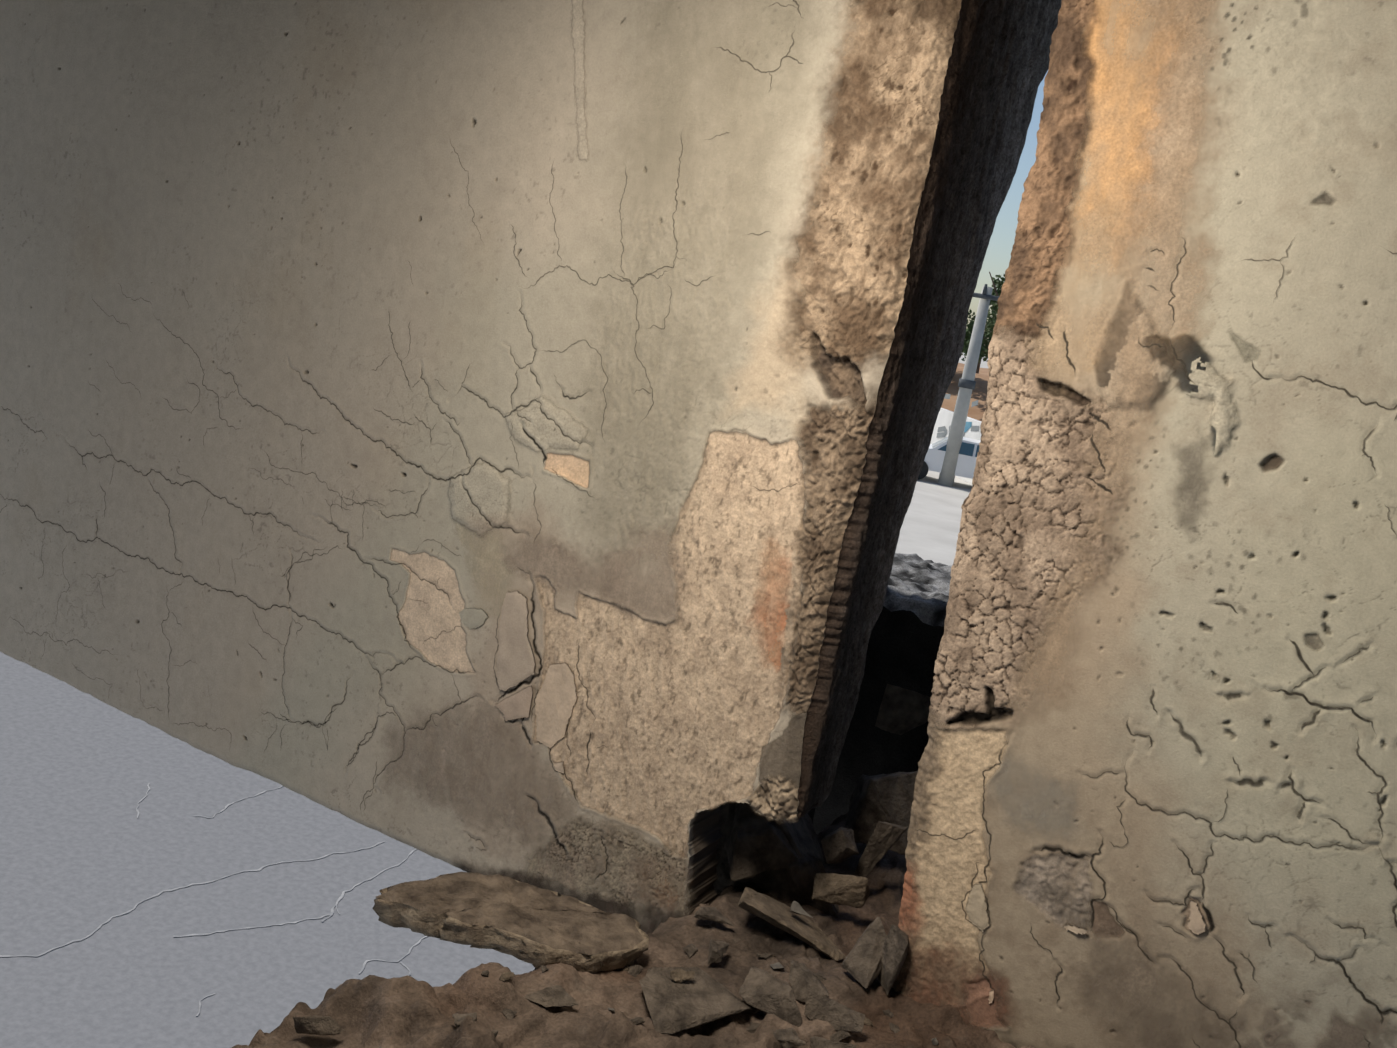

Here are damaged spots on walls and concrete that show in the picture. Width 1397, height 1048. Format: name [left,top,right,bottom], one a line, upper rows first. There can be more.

rust [1074,0,1196,273]
crack [5,145,709,914]
peeling [390,0,960,857]
spalling [892,0,1124,1026]
crack [1036,323,1075,371]
rust [1036,264,1110,367]
crack [1087,413,1112,493]
crack [1138,242,1192,382]
crack [1246,240,1293,297]
crack [1252,363,1397,470]
crack [1040,641,1397,1048]
crack [1030,927,1063,1002]